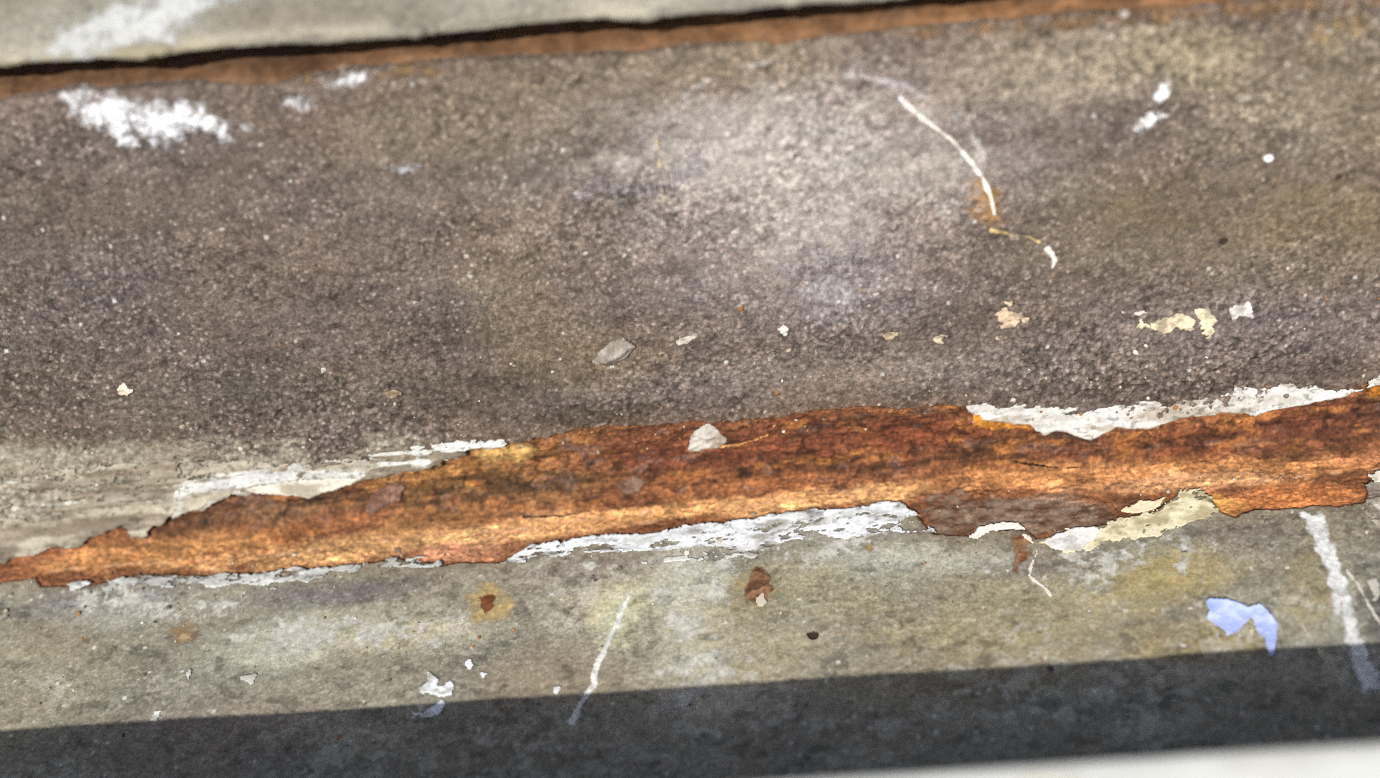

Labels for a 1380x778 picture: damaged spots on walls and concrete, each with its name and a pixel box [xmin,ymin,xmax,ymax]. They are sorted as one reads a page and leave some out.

efflorescence [61,92,226,146]
spalling [0,374,1380,593]
rust [466,583,514,623]
rust [734,567,778,607]
rust [1011,533,1052,597]
peeling [1367,578,1380,601]